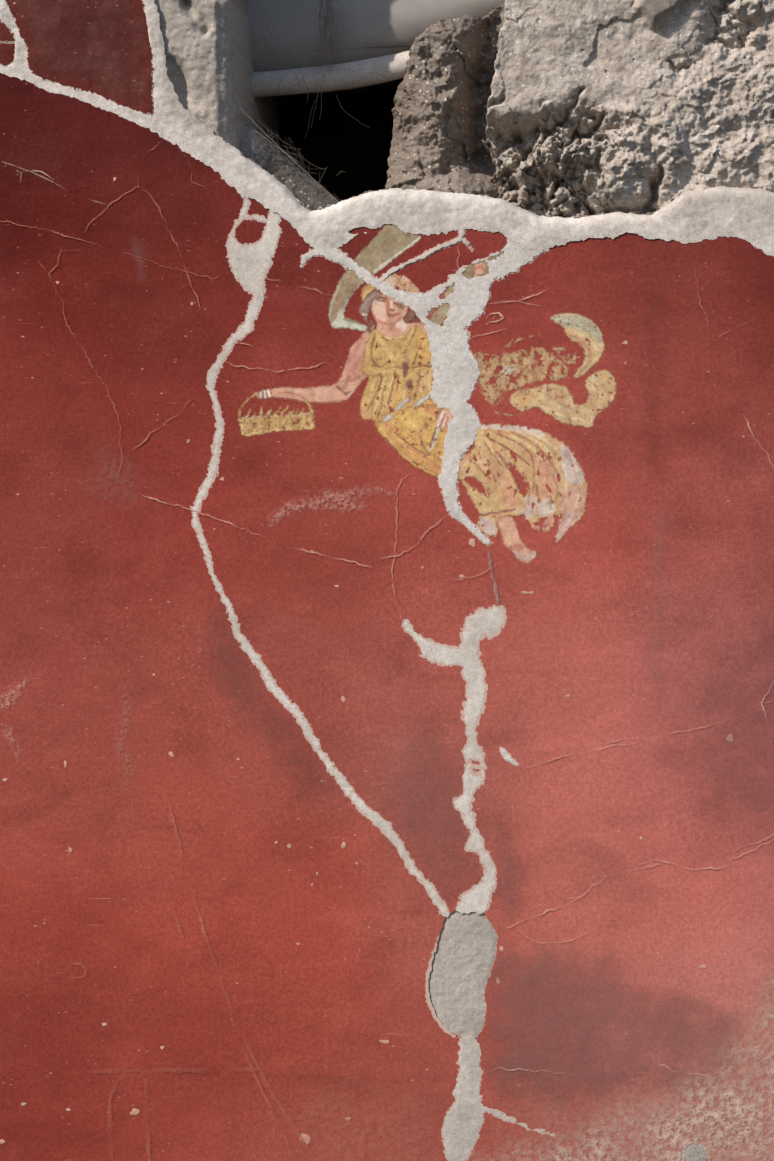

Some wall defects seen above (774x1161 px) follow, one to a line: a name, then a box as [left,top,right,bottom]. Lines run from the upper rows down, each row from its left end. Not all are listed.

spalling [278,0,774,218]
crack [1,185,177,276]
flaking render [301,240,549,547]
crack [63,197,504,917]
efflorescence [541,1046,774,1161]